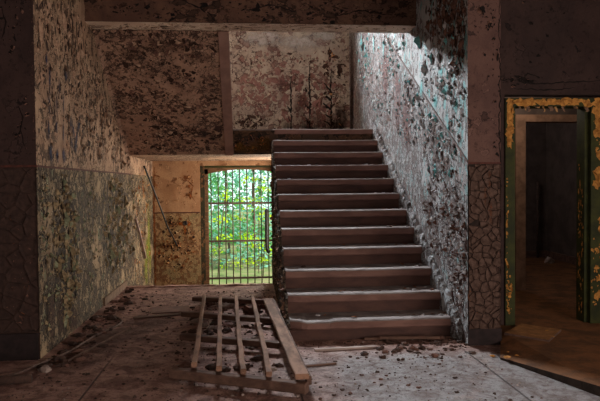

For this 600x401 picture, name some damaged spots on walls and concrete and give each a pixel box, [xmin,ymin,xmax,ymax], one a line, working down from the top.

peeling [30,0,131,171]
peeling [106,2,222,153]
peeling [197,0,467,322]
crack [468,5,600,329]
peeling [493,97,600,189]
crack [0,168,49,341]
peeling [39,170,197,334]
peeling [505,252,513,314]
peeling [591,238,600,305]